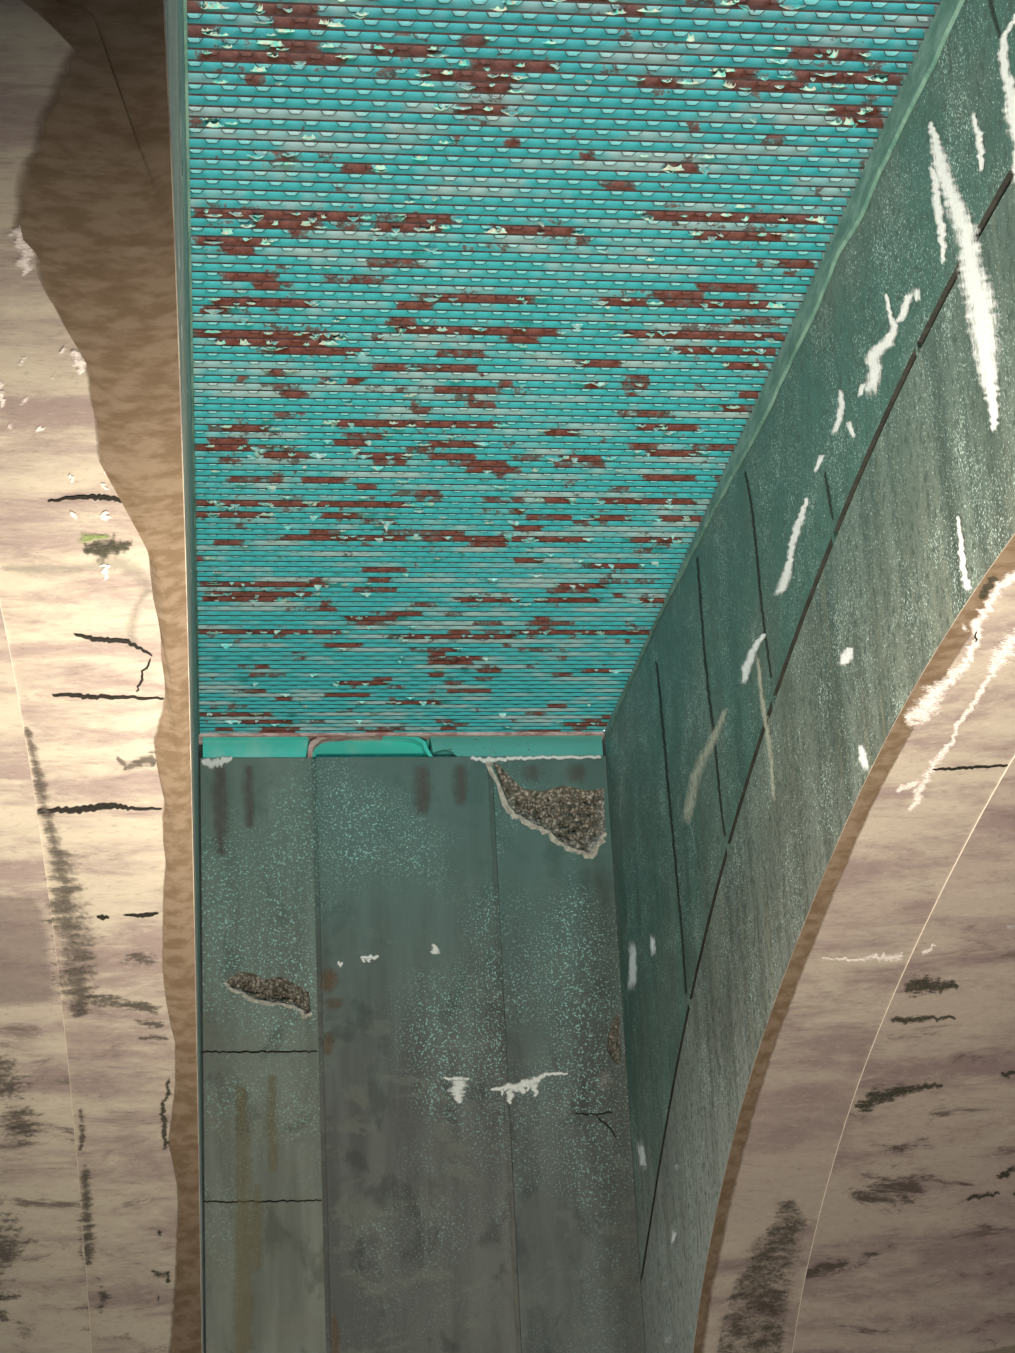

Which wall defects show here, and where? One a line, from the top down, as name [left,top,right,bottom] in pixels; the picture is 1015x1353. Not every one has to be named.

water stain [972,113,985,171]
crack [988,0,1015,181]
water stain [928,122,1000,430]
water stain [776,497,808,595]
crack [897,571,1015,810]
spalling [471,755,607,859]
water stain [685,712,725,817]
water stain [693,516,1015,1353]
spalling [223,972,312,1019]